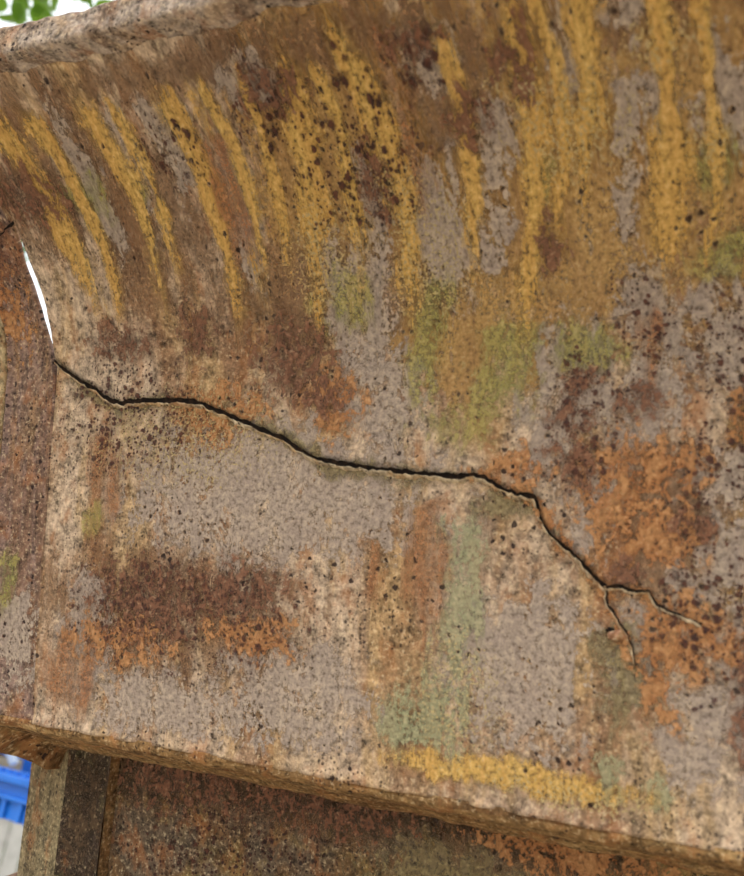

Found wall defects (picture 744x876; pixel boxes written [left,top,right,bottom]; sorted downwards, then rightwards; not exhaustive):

damp [154,55,367,327]
rust [0,0,744,464]
damp [324,13,421,325]
damp [431,29,485,282]
damp [500,0,608,328]
damp [646,0,729,277]
rust [40,534,310,688]
crack [54,359,702,668]
rust [399,497,452,650]
rust [116,758,709,876]